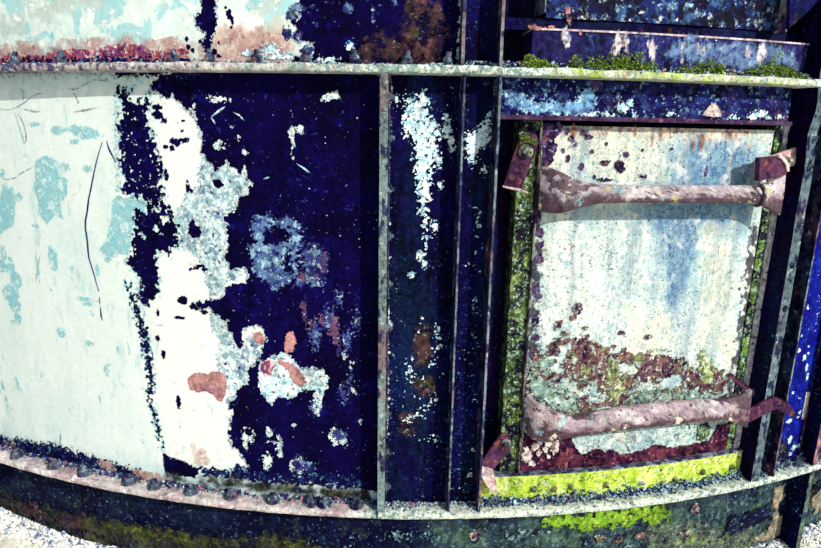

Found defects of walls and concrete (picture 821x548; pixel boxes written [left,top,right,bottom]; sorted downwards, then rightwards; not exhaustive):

rust [0,27,290,64]
peeling [180,0,234,62]
peeling [282,0,417,64]
rust [357,0,450,65]
peeling [425,0,461,64]
peeling [32,155,70,229]
peeling [0,245,22,326]
peeling [50,72,456,494]
rust [188,372,227,402]
rust [525,302,731,415]
rust [398,412,420,436]
leakage [384,530,442,542]